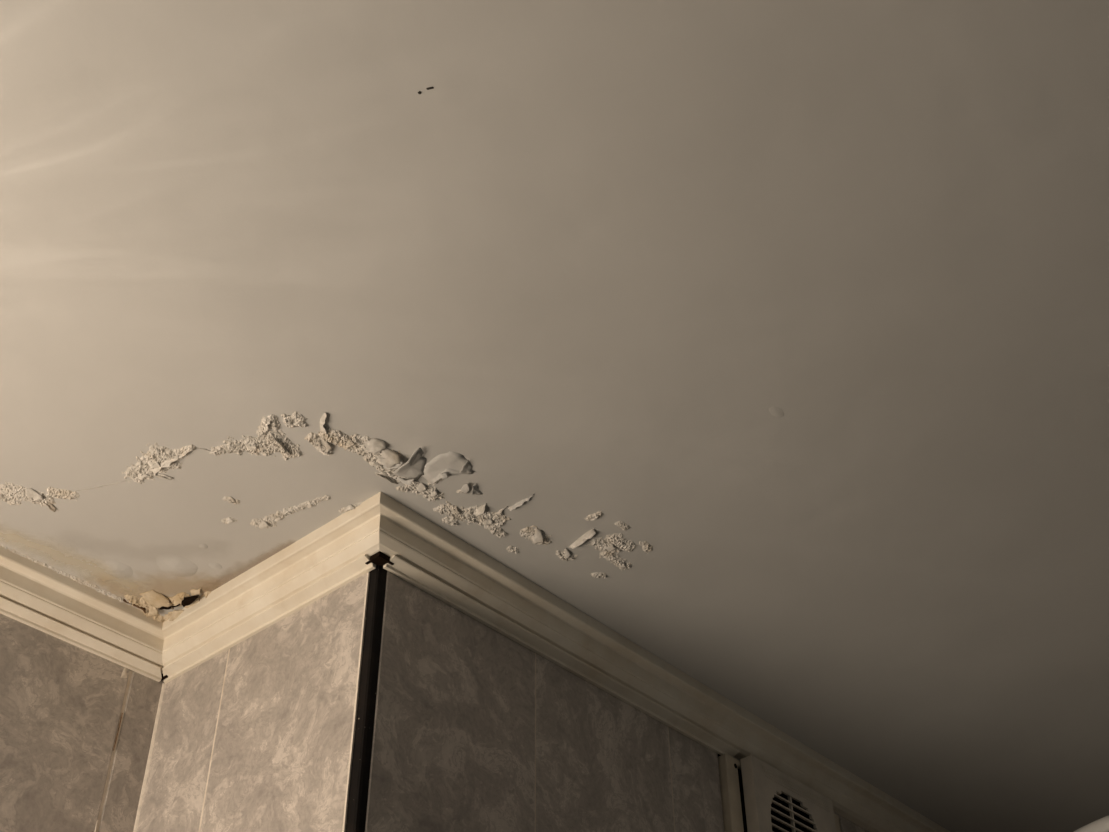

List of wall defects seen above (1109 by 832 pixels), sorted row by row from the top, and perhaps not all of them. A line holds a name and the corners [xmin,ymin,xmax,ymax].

peeling [0,481,80,512]
peeling [122,442,197,484]
peeling [209,411,653,579]
spalling [0,544,211,623]